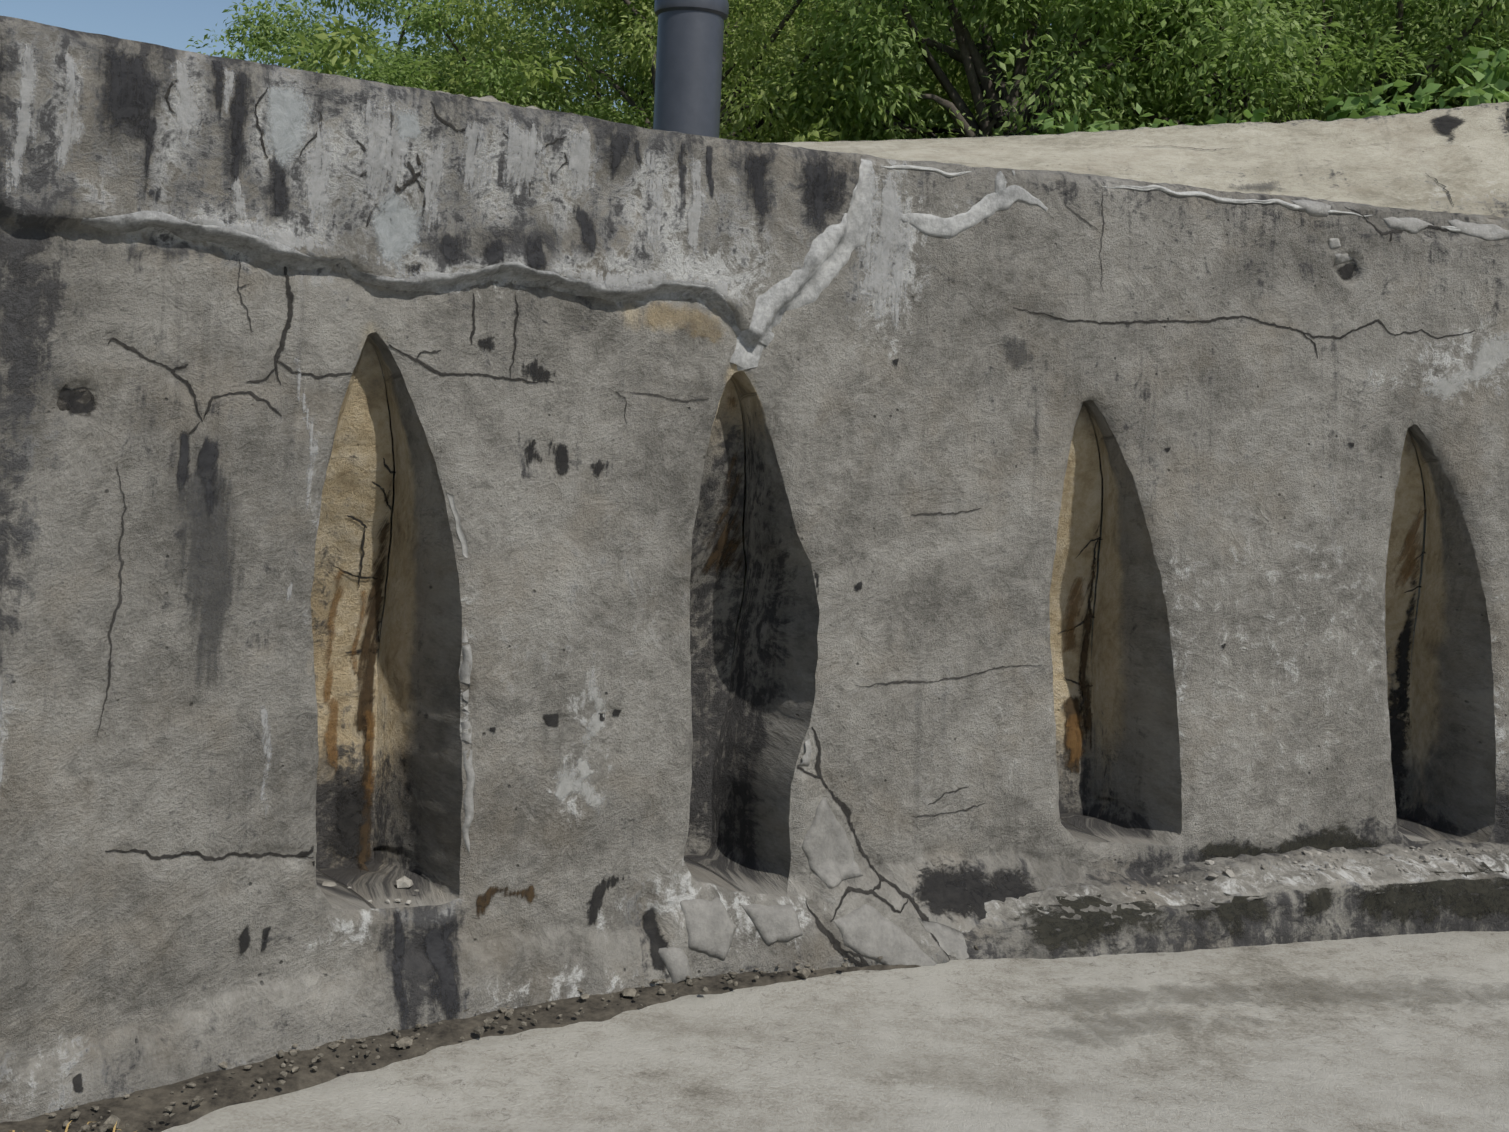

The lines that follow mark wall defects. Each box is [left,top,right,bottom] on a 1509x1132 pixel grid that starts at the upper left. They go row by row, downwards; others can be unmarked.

water stain [6,46,36,193]
water stain [98,46,331,252]
crack [108,260,352,434]
water stain [364,99,728,298]
crack [1013,188,1475,359]
water stain [177,431,232,680]
corrosion [324,522,390,871]
spalling [543,713,559,727]
corrosion [1063,524,1100,773]
crack [105,845,315,866]
crack [797,727,950,968]
mould [915,857,1041,922]